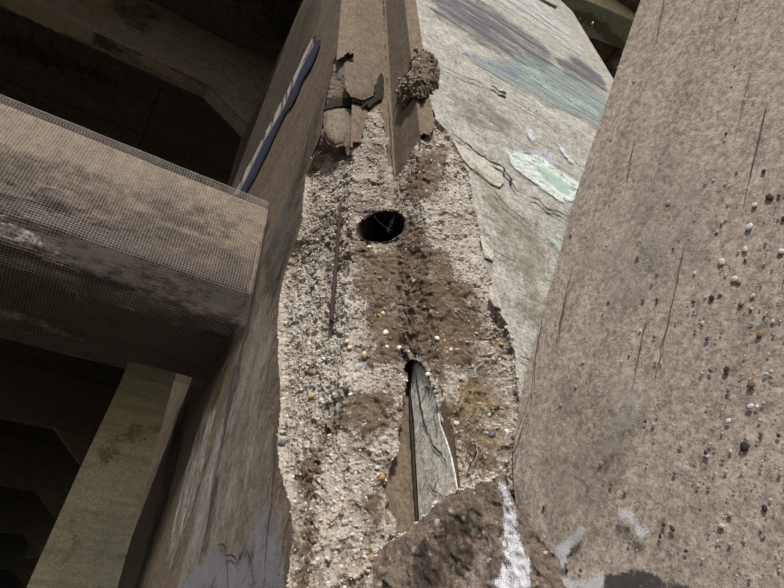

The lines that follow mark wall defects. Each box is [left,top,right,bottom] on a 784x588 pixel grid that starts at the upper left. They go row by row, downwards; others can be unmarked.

crack [453,133,570,233]
spalling [276,47,520,588]
leakage [347,140,532,588]
crack [635,311,648,374]
crack [658,247,684,364]
crack [413,368,448,504]
crack [217,430,276,588]